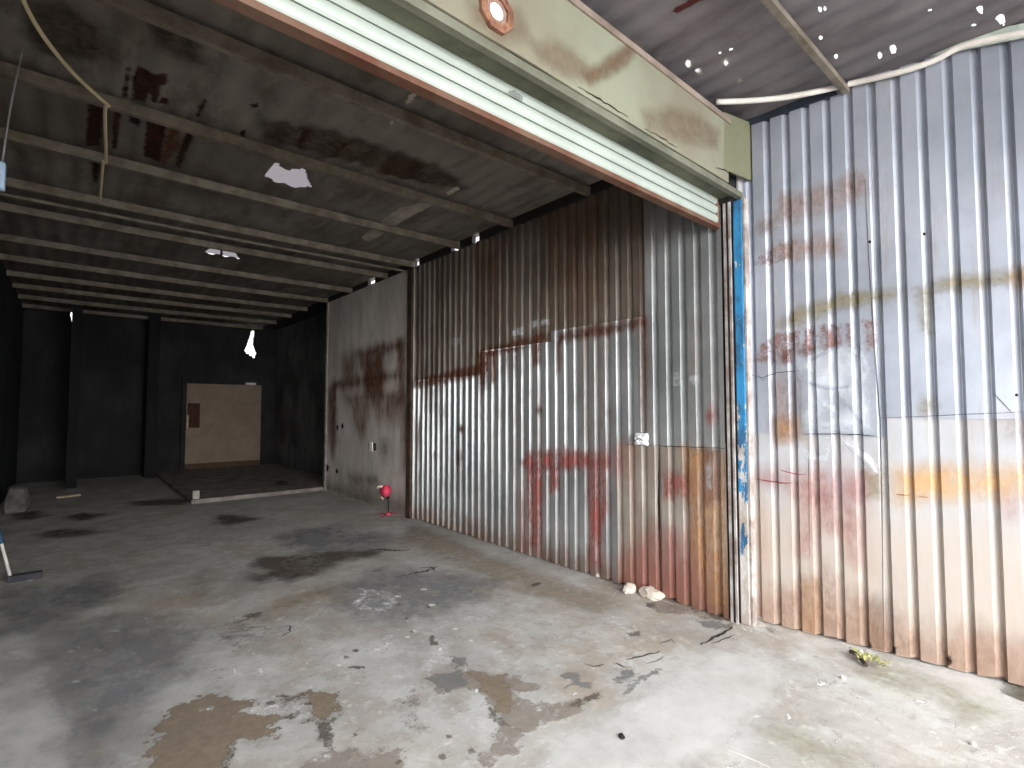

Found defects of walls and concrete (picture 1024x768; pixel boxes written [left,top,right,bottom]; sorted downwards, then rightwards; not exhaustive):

corrosion [122,67,169,104]
corrosion [86,104,193,168]
corrosion [92,162,100,183]
corrosion [559,321,646,359]
corrosion [329,334,544,451]
corrosion [904,471,968,494]
damp [253,528,382,581]
corrosion [695,495,723,599]
spalling [336,635,392,669]
spalling [423,635,600,767]
spalling [142,688,403,768]